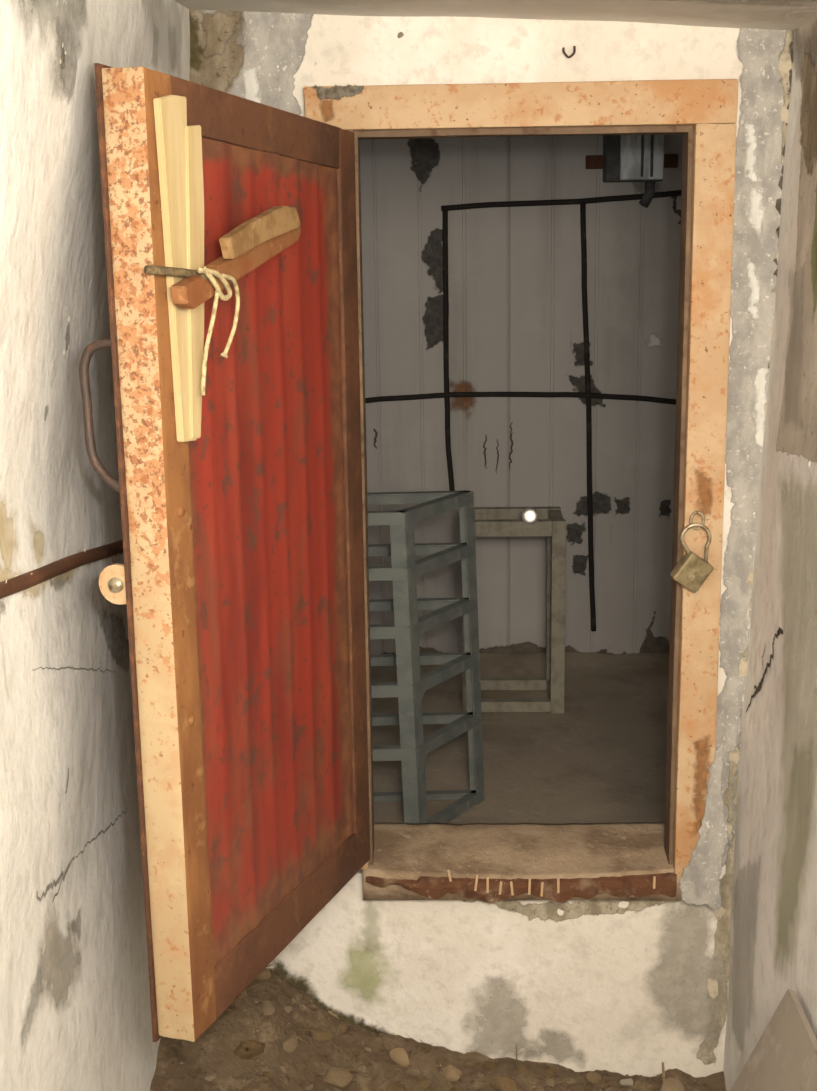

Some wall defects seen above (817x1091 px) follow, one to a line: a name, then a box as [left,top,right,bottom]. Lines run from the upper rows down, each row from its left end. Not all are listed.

damp [23,0,85,98]
flaking render [189,9,313,115]
peeling [407,138,440,188]
damp [800,54,817,174]
peeling [421,229,443,350]
flaking render [696,18,817,1065]
crack [746,627,783,712]
crack [37,809,127,903]
damp [22,910,81,1043]
damp [470,980,582,1061]
damp [651,904,724,1042]